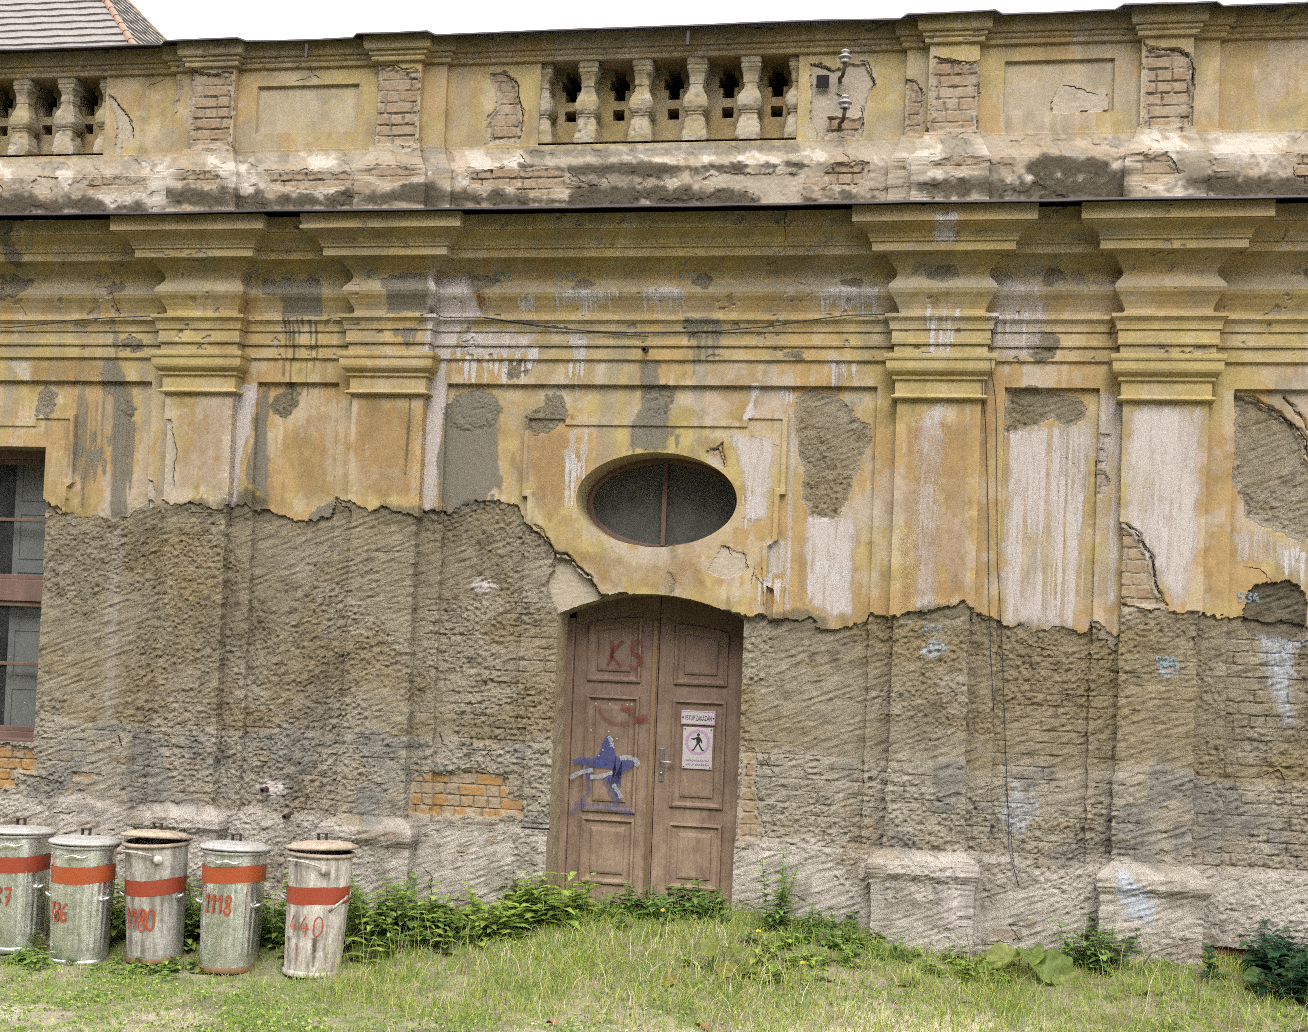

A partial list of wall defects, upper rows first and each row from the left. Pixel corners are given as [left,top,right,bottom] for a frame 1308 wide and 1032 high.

spalling [176,69,235,190]
spalling [262,66,420,193]
spalling [905,58,991,175]
spalling [1141,42,1194,134]
damp [69,318,135,518]
spalling [795,389,872,520]
spalling [1004,386,1087,435]
spalling [1232,395,1308,543]
crack [535,526,603,599]
crack [1127,525,1168,606]
spalling [0,420,628,912]
spalling [727,523,1308,967]